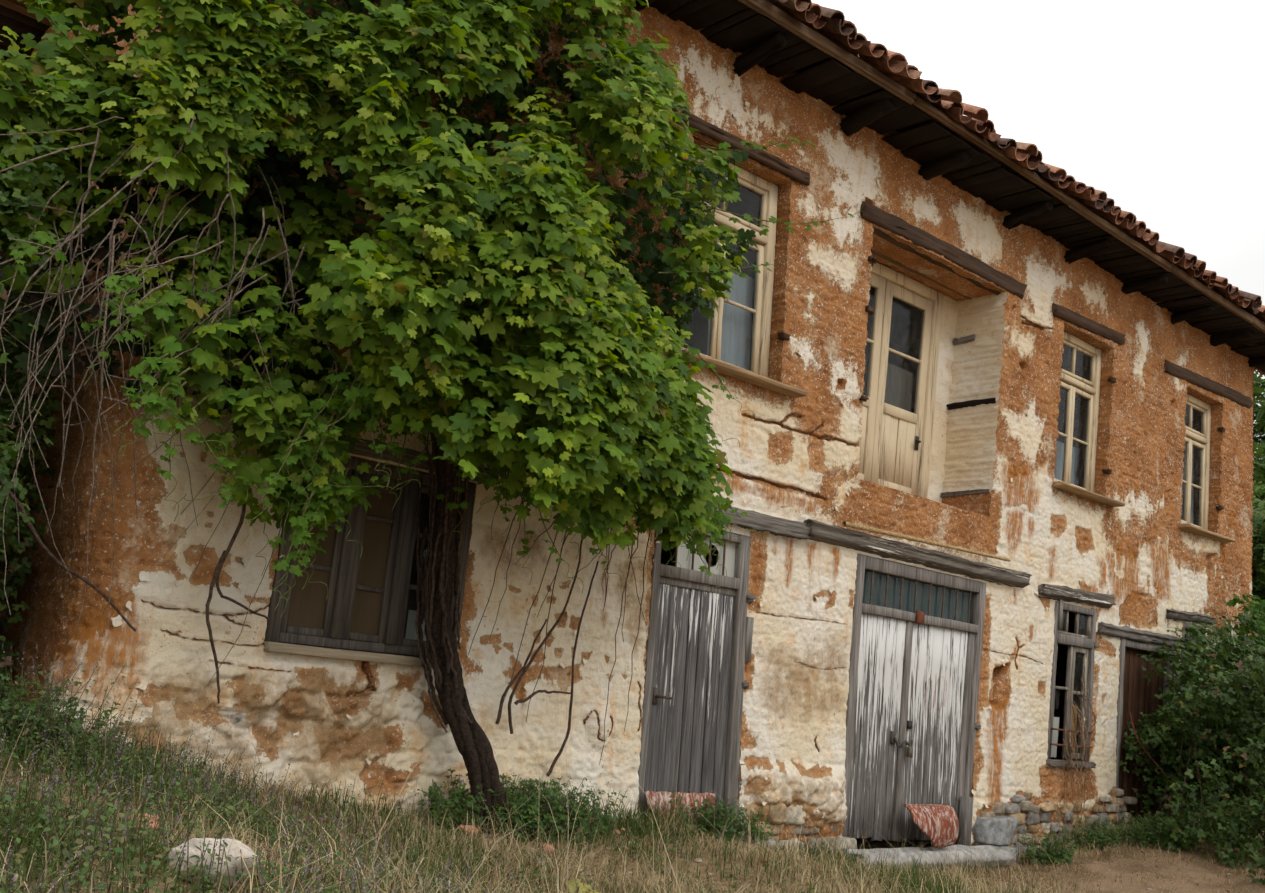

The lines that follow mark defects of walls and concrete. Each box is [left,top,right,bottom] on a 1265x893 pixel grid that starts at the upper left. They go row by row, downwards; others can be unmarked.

flaking render [30,3,163,59]
flaking render [90,158,161,202]
flaking render [170,147,384,251]
flaking render [0,211,285,722]
flaking render [136,660,421,798]
flaking render [395,671,447,728]
flaking render [740,653,845,844]
flaking render [971,594,1116,846]